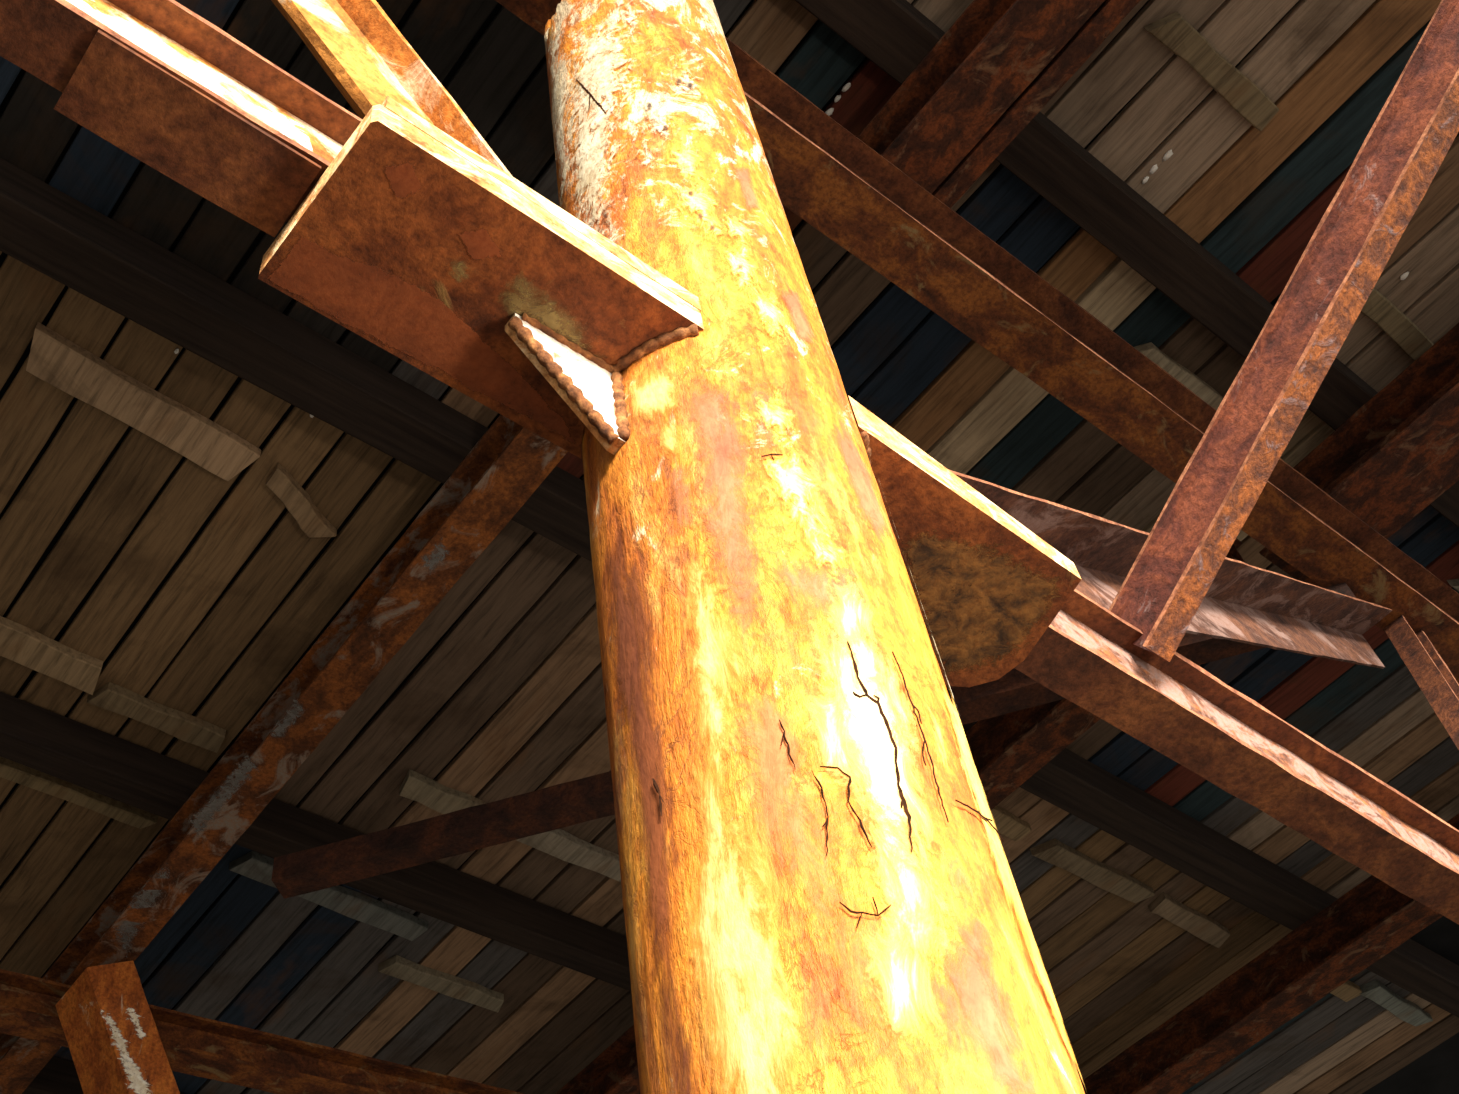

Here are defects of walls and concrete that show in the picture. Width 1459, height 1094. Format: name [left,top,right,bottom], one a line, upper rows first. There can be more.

peeling [548,0,791,338]
corrosion [737,168,758,207]
corrosion [782,292,812,340]
corrosion [691,390,757,621]
corrosion [837,427,885,535]
corrosion [610,537,693,1094]
crack [779,719,872,856]
crack [847,641,1004,852]
crack [839,897,891,928]
corrosion [935,921,1033,1094]